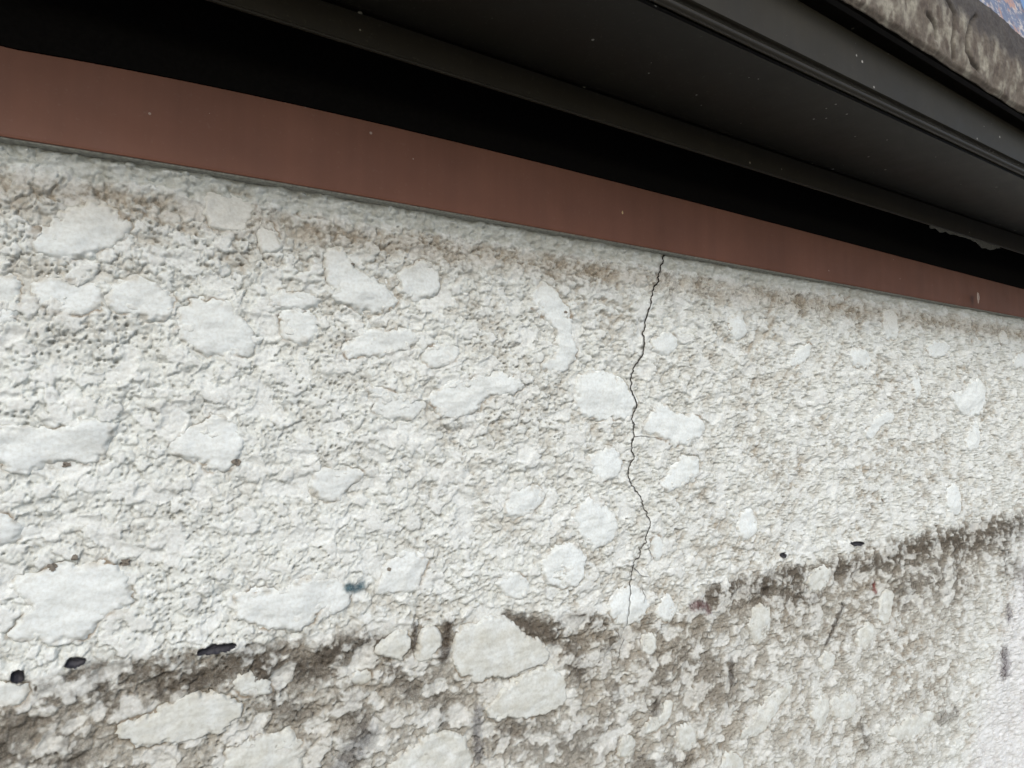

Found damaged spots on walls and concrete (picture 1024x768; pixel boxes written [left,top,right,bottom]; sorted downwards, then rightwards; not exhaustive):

crack [618,255,665,659]